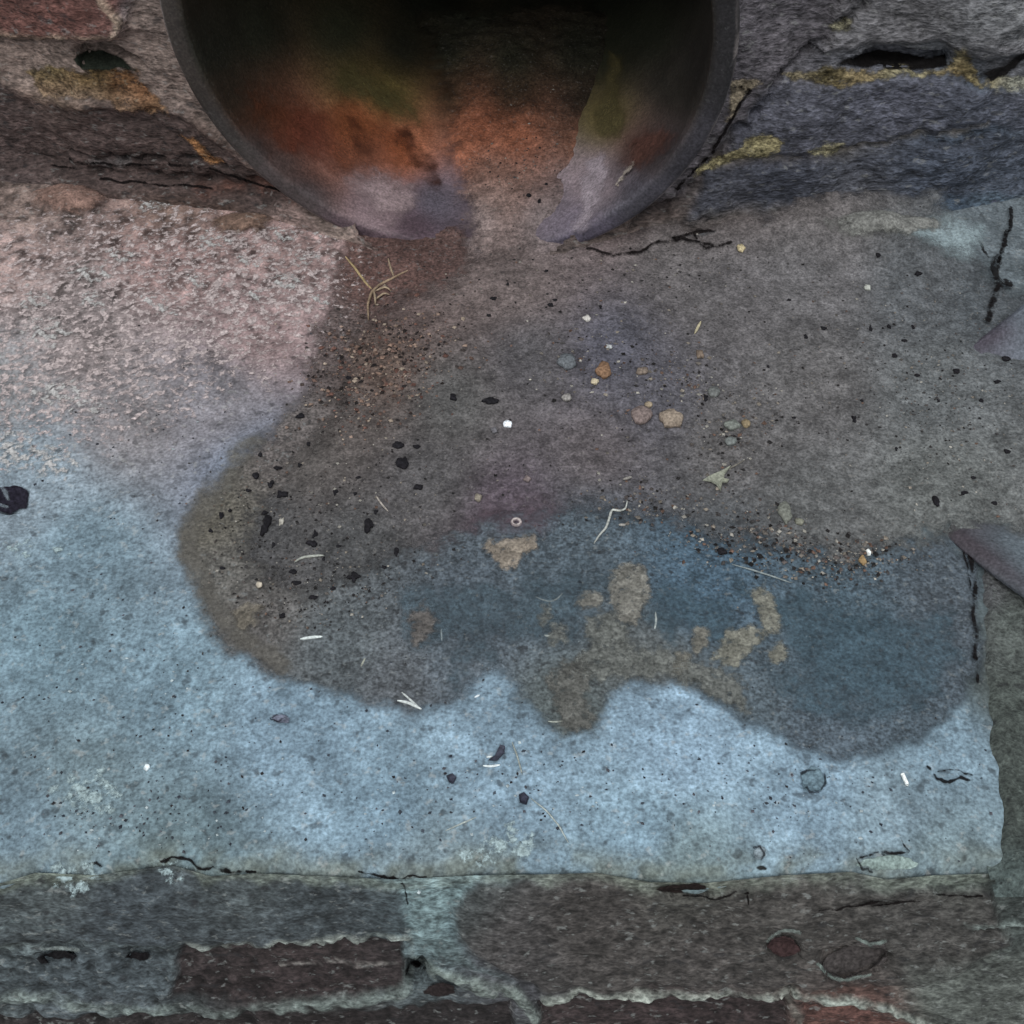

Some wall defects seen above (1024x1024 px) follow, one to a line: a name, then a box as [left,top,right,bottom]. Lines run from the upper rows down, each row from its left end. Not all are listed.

corrosion [182,136,224,163]
crack [586,229,732,256]
crack [973,206,1014,322]
damp [0,199,983,761]
crack [963,552,979,683]
efflorescence [49,768,122,815]
efflorescence [455,821,534,867]
efflorescence [51,862,97,896]